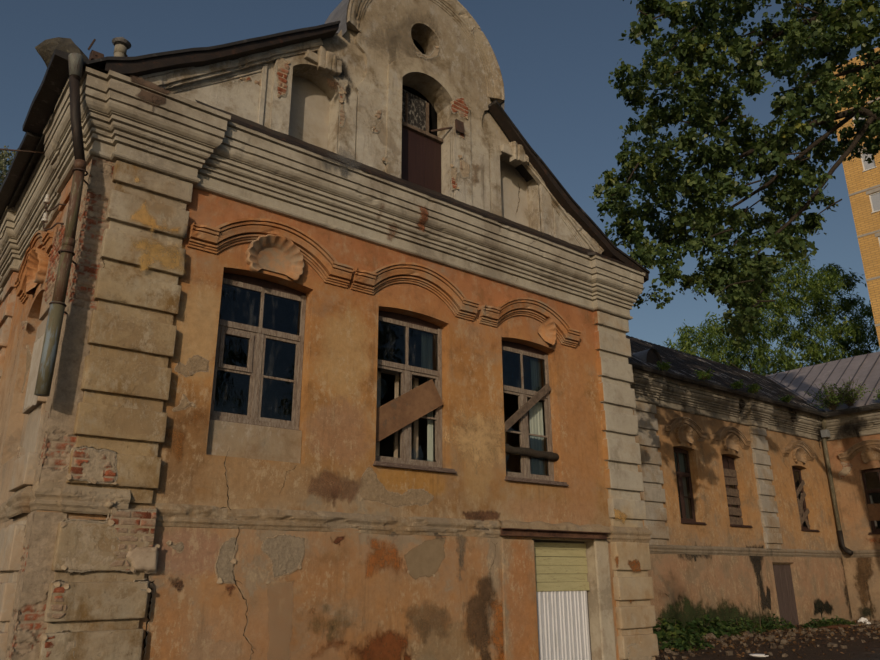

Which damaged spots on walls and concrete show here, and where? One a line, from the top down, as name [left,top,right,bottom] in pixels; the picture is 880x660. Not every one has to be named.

crack [222,449,254,660]